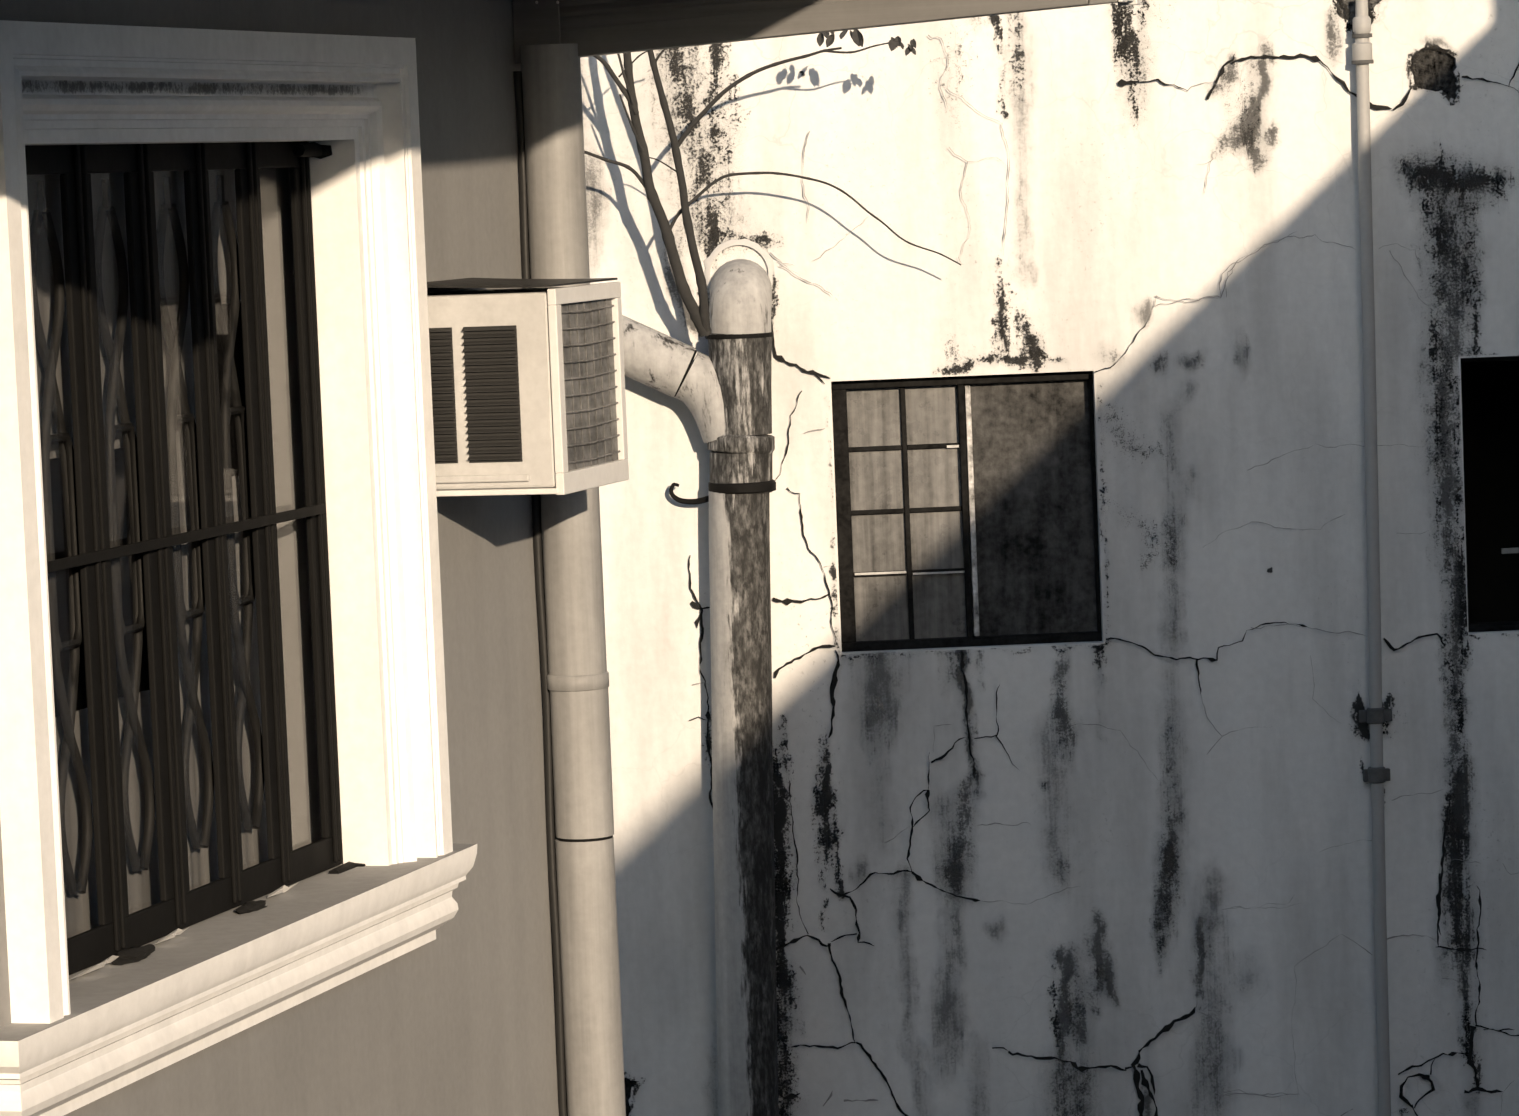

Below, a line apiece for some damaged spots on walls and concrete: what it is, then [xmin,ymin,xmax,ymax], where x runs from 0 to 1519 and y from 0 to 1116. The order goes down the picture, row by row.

leakage [654,43,780,261]
leakage [1111,0,1169,121]
leakage [1212,44,1277,172]
crack [1117,53,1412,111]
spalling [1332,0,1382,34]
spalling [1406,39,1463,105]
crack [688,555,713,809]
leakage [1398,143,1514,1093]
leakage [772,715,865,1116]
crack [776,651,1079,1116]
spalling [624,1072,645,1116]
crack [992,954,1214,1116]